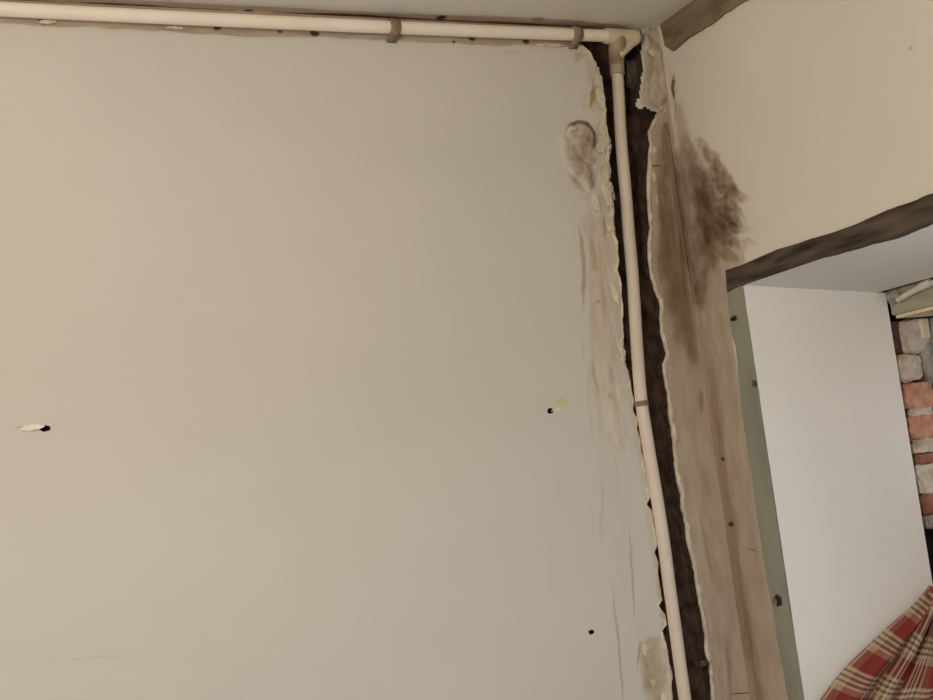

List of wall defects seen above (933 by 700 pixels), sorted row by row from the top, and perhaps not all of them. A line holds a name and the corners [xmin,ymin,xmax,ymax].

peeling [583,53,635,454]